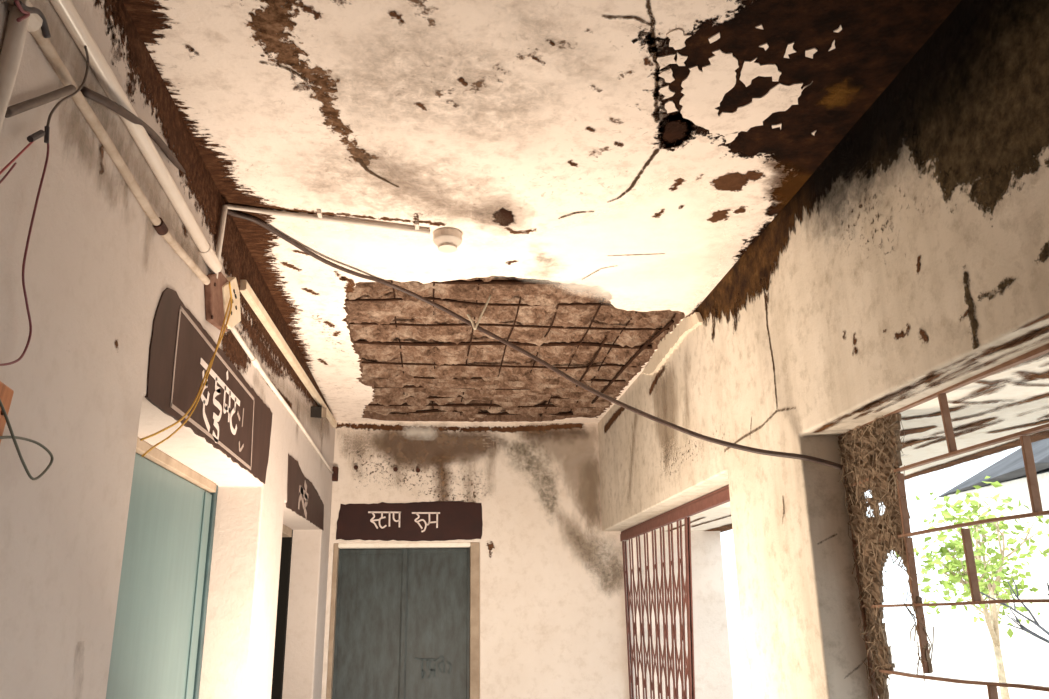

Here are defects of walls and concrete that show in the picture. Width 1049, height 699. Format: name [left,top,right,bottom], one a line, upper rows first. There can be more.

spalling [95,0,704,434]
crack [559,149,659,219]
crack [602,0,660,123]
peeling [631,0,962,264]
crack [724,293,793,452]
damp [349,428,500,502]